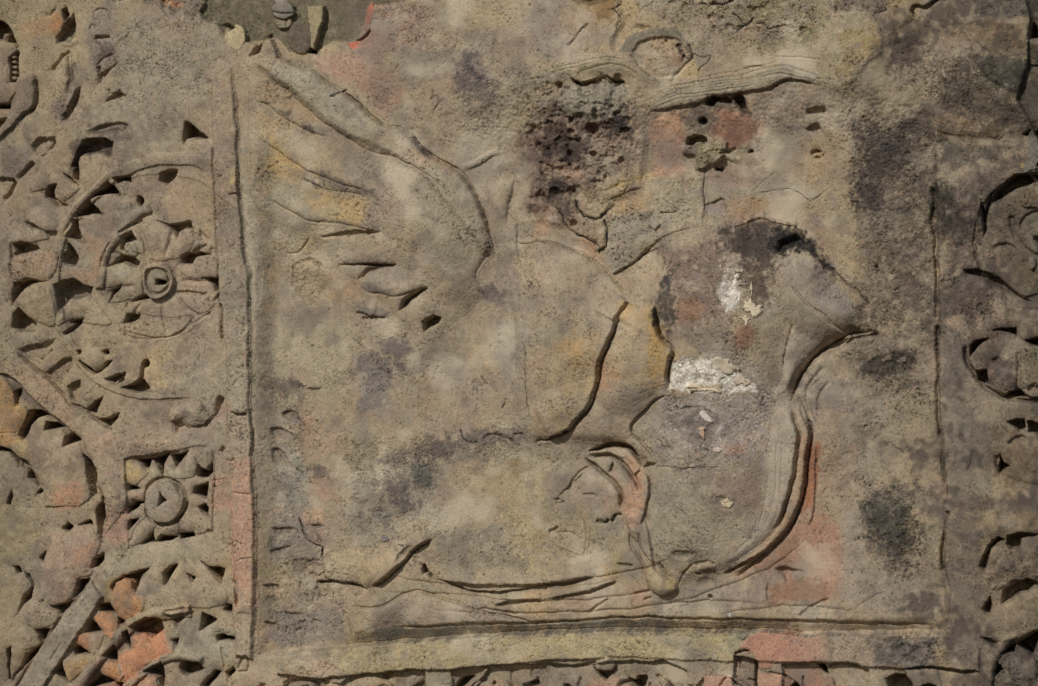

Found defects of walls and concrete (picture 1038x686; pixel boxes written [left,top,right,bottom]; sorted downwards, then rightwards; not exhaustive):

spalling [562,81,627,121]
leakage [737,261,775,298]